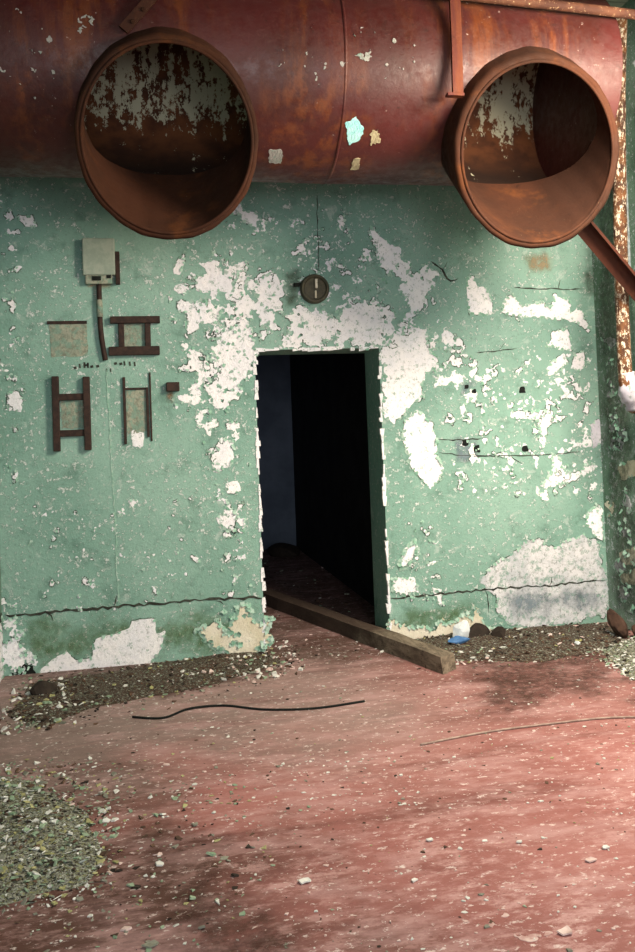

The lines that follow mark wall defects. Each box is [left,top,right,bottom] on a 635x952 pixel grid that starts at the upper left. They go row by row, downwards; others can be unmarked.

peeling [340,51,372,67]
peeling [268,149,283,164]
peeling [345,117,381,146]
peeling [0,200,38,274]
peeling [1,291,30,355]
peeling [124,324,145,346]
peeling [0,359,25,412]
peeling [60,400,84,429]
peeling [126,390,147,448]
peeling [168,202,635,654]
peeling [138,536,202,603]
peeling [0,597,166,682]